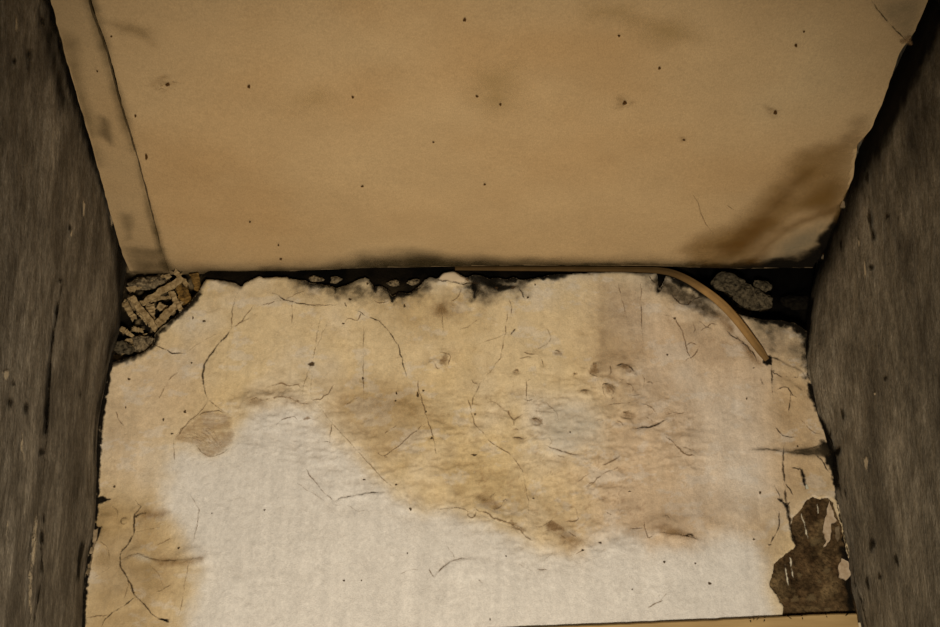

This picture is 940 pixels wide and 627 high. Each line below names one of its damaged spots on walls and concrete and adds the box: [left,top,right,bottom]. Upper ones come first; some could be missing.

damp [693,0,940,285]
crack [82,352,153,627]
crack [180,298,405,431]
peeling [439,272,468,282]
crack [762,332,849,557]
spalling [769,468,859,622]